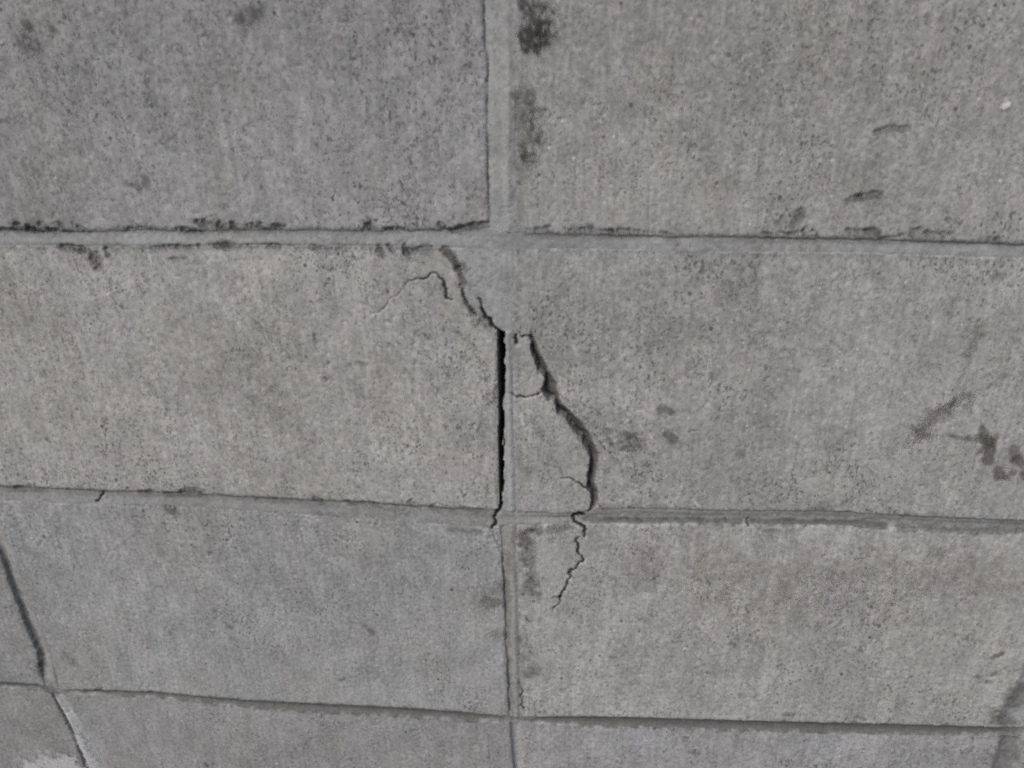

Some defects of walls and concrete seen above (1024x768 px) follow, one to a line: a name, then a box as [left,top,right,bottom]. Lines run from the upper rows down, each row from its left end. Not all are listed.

leakage [519,0,550,54]
crack [419,273,600,608]